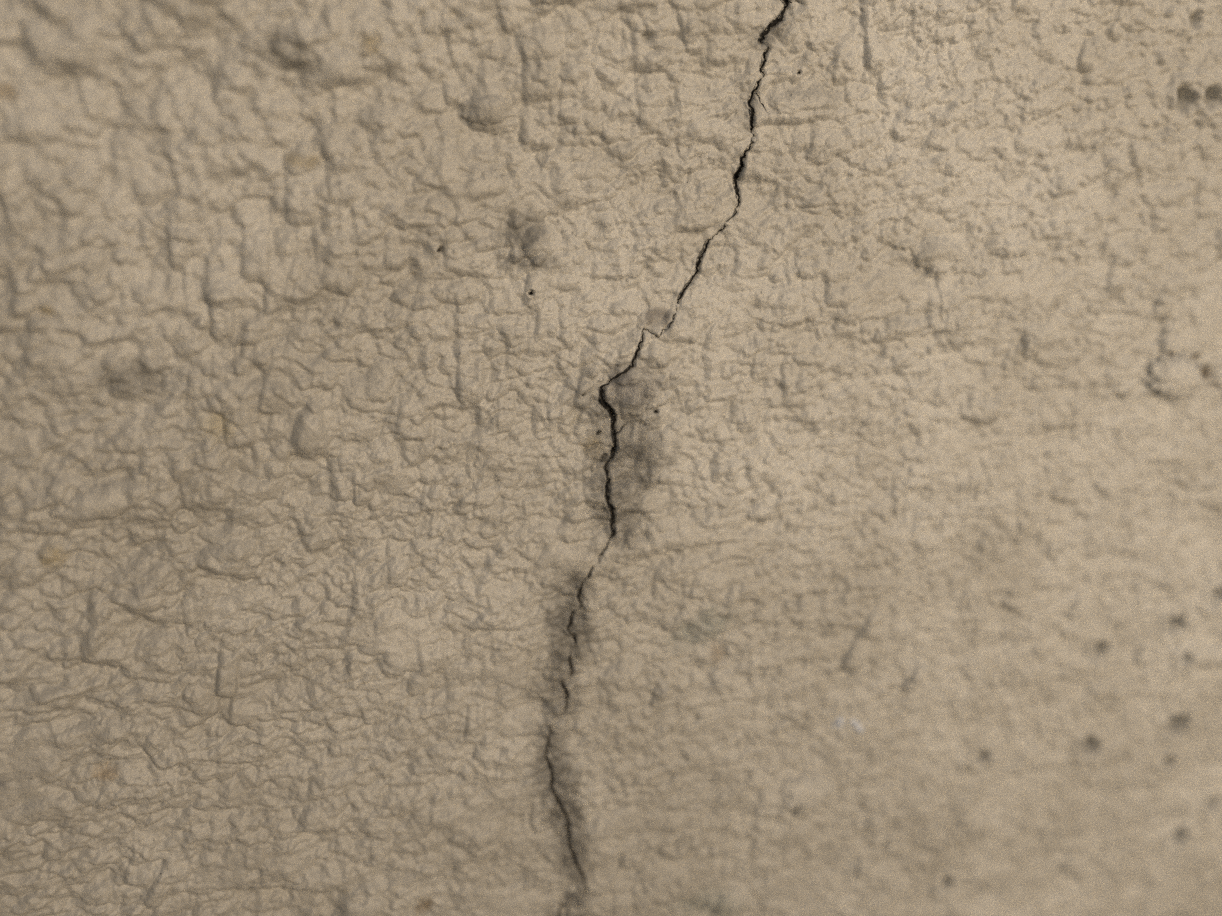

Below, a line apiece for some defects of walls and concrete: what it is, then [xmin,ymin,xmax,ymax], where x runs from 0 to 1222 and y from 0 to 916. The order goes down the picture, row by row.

crack [545,0,799,916]